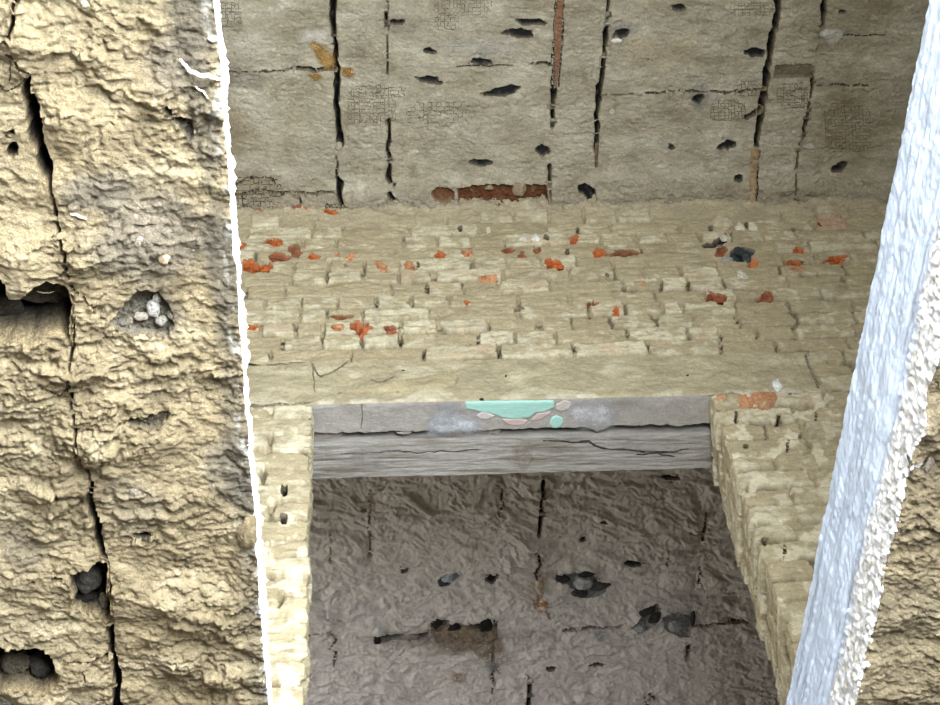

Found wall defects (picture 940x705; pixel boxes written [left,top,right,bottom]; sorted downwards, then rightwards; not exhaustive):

spalling [429,182,551,206]
crack [754,150,762,200]
spalling [107,290,175,338]
crack [0,0,123,705]
crack [543,440,689,457]
spalling [554,571,611,599]